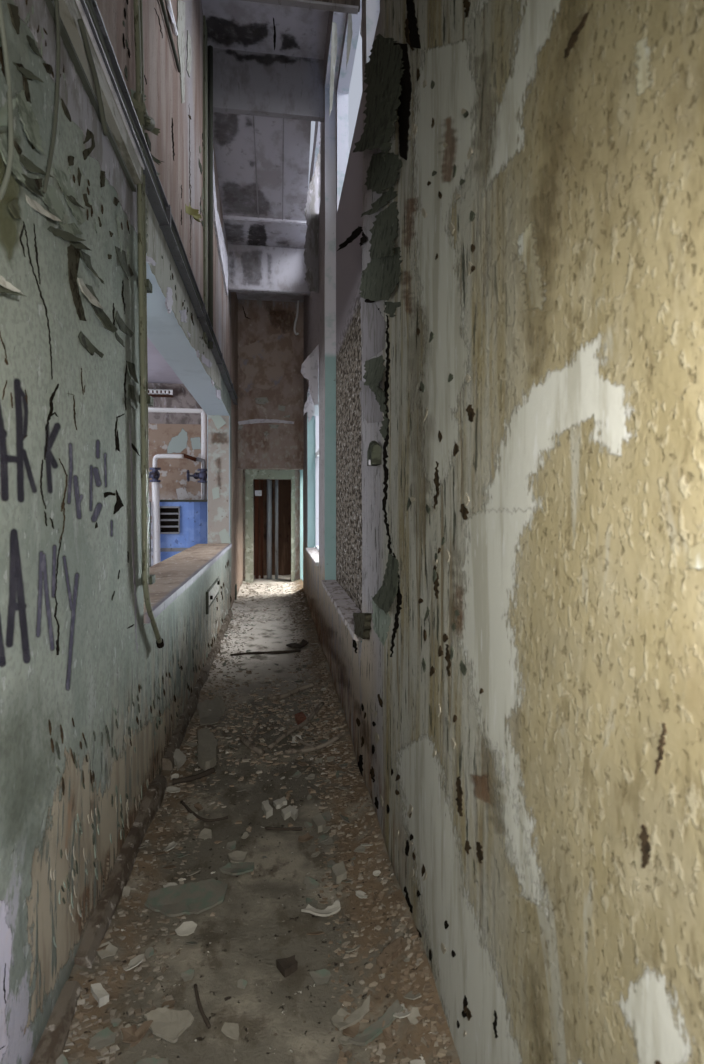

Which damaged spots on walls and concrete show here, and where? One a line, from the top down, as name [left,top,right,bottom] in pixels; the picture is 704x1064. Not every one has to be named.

flaking render [0,0,221,390]
leakage [214,112,251,145]
leakage [206,16,305,65]
leakage [224,183,288,284]
peeling [304,141,320,293]
peeling [329,0,560,514]
crack [0,221,85,655]
peeling [422,334,636,917]
peeling [0,900,14,1062]
flaking render [22,560,232,1036]
peeling [380,733,522,1064]
peeling [618,960,694,1064]